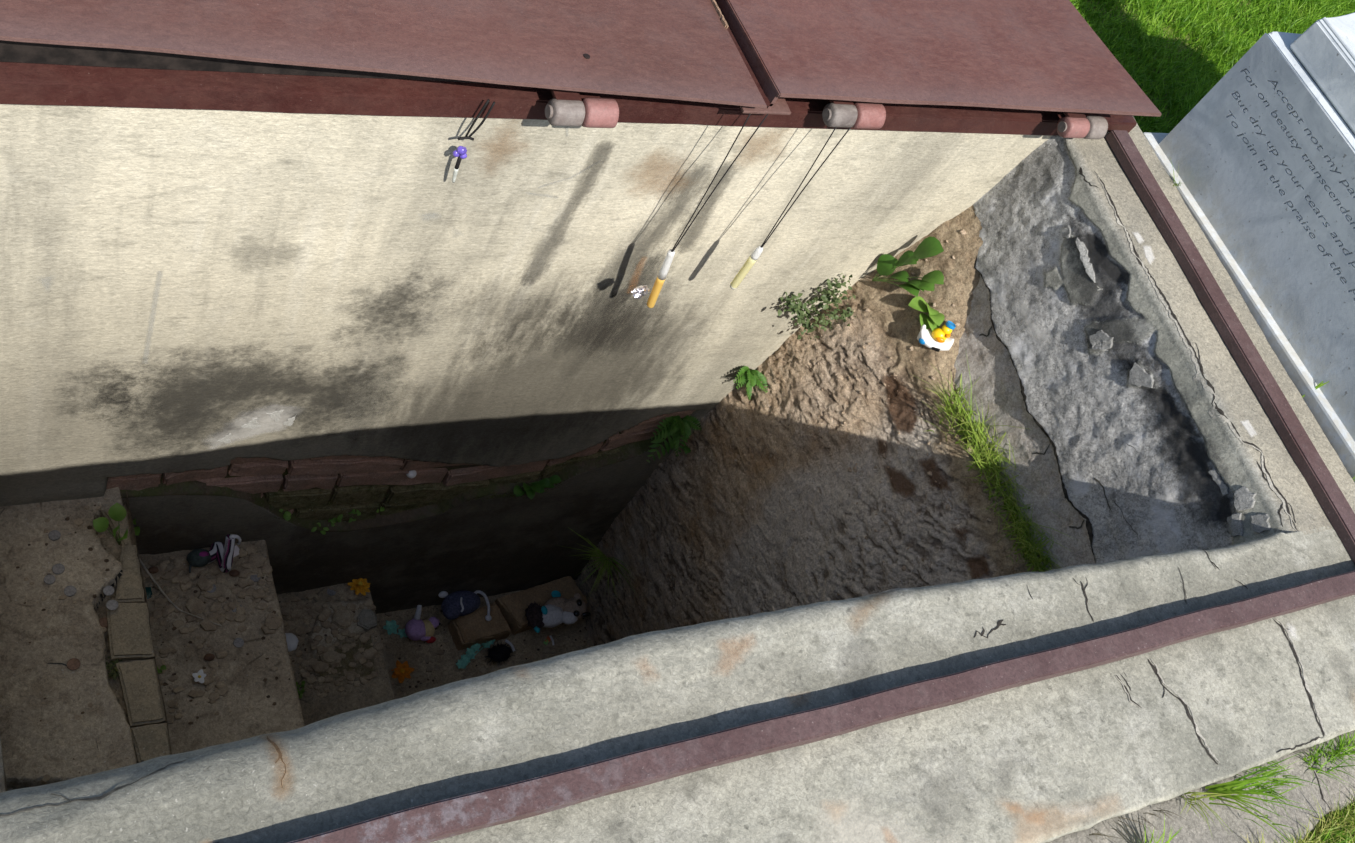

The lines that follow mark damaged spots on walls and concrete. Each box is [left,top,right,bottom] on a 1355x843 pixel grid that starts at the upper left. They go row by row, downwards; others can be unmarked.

spalling [1061,225,1096,283]
leakage [131,363,376,442]
spalling [106,409,696,521]
crack [974,256,1138,622]
spalling [1089,330,1114,350]
spalling [1128,362,1154,388]
crack [1079,167,1298,531]
crack [94,570,123,609]
crack [974,620,1006,638]
crack [1116,658,1220,764]
crack [1274,617,1331,814]
crack [0,760,185,816]